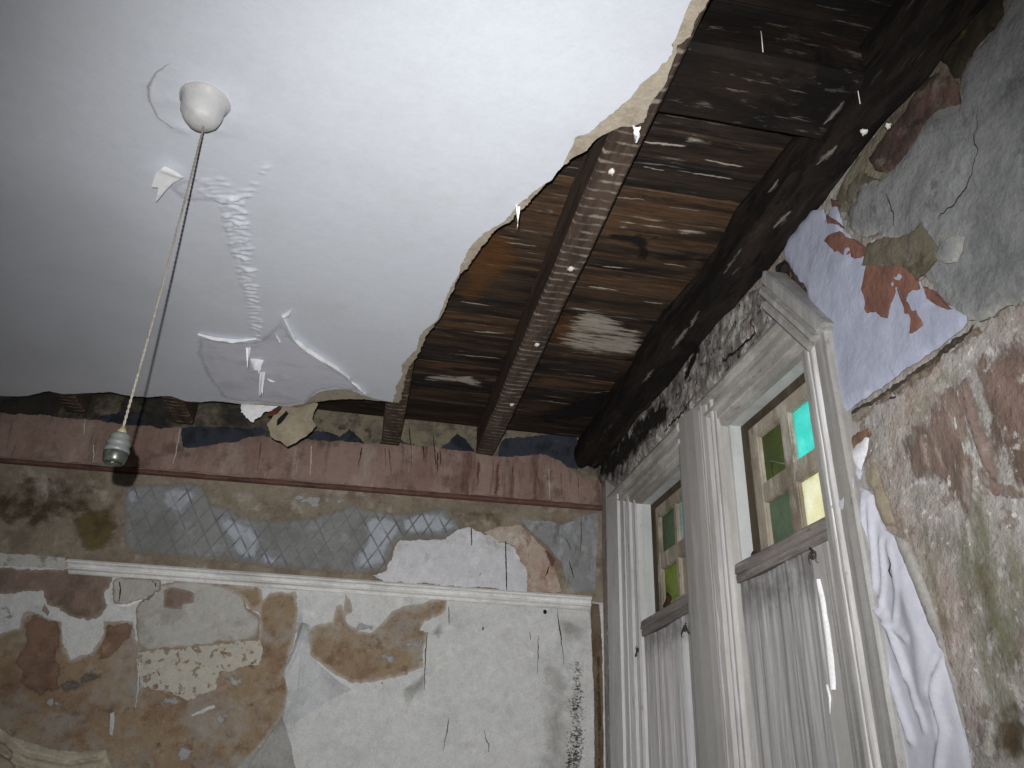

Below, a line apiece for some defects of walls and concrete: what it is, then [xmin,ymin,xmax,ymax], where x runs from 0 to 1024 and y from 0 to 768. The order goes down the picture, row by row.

peeling [152,166,215,201]
spalling [564,0,709,165]
peeling [775,0,1005,422]
crack [937,108,978,220]
peeling [198,184,545,407]
peeling [442,434,474,452]
peeling [498,434,578,469]
spalling [597,287,775,488]
peeling [0,567,298,768]
peeling [309,594,447,684]
peeling [372,525,561,593]
leakage [566,603,604,768]